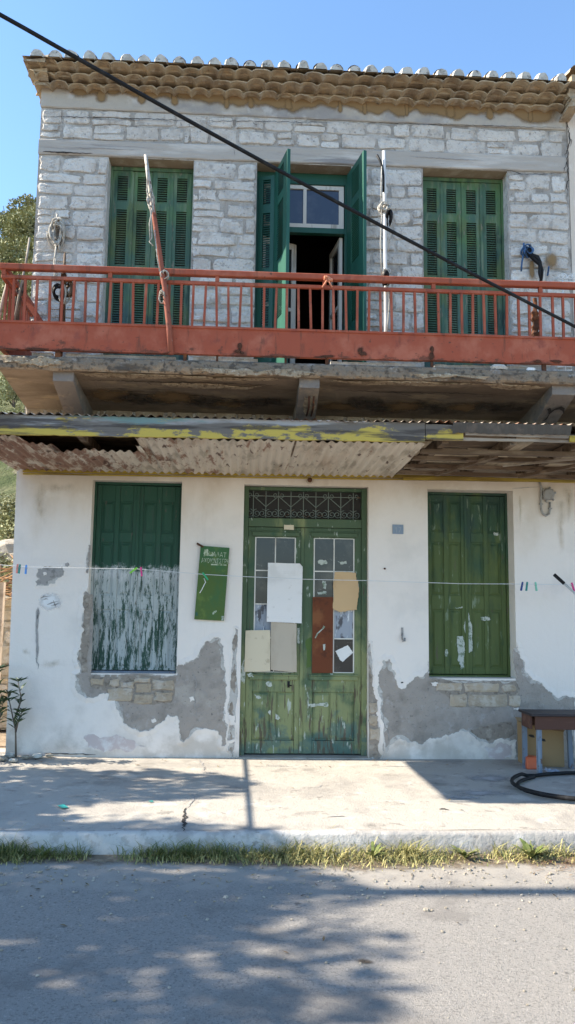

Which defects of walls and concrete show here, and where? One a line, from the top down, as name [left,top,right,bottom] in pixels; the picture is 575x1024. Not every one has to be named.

peeling [33,561,71,589]
peeling [70,545,240,758]
peeling [367,607,575,760]